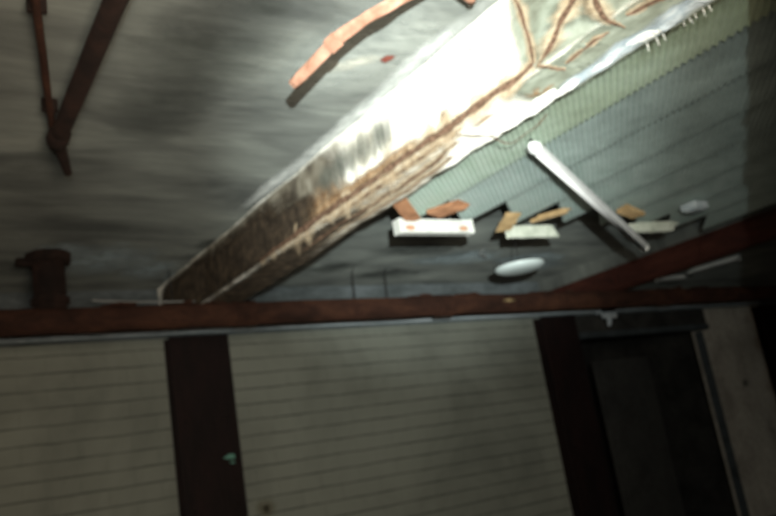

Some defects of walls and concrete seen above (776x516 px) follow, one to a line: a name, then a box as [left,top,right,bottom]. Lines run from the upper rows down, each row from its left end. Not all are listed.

damp [321,126,384,183]
crack [260,0,665,264]